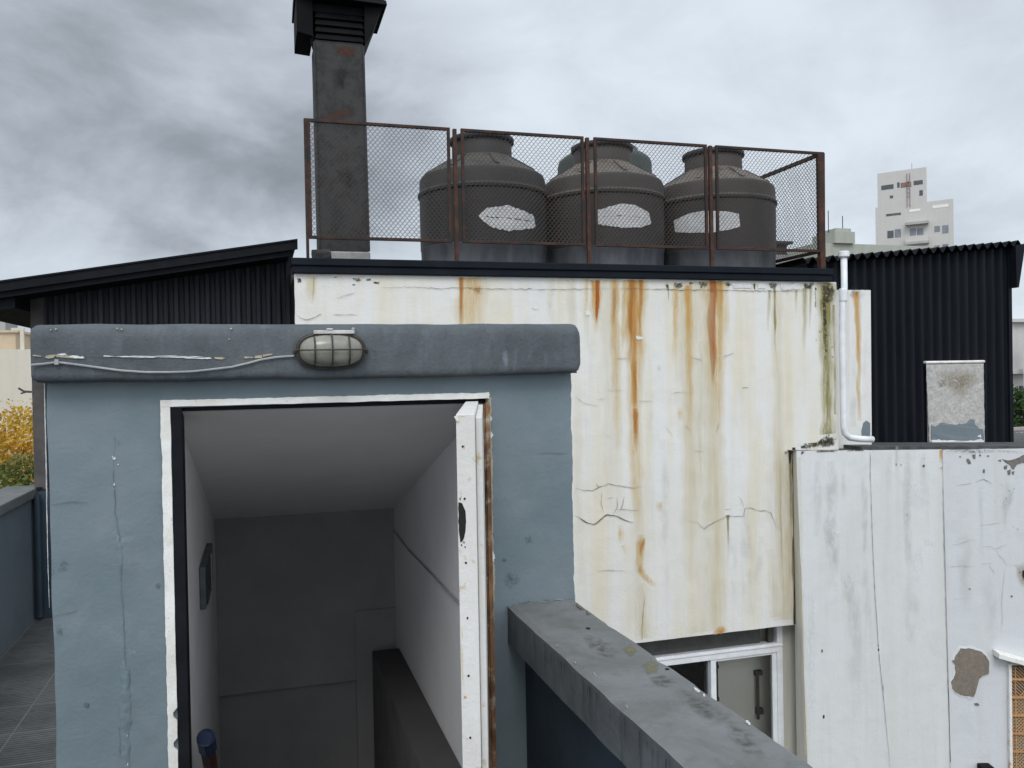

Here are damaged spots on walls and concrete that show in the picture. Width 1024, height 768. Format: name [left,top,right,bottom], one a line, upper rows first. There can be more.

corrosion [459,277,480,315]
corrosion [708,280,723,376]
corrosion [591,280,643,436]
peeling [931,434,1024,475]
spalling [458,498,466,548]
crack [547,483,641,525]
crack [695,462,782,554]
corrosion [637,540,648,580]
peeling [948,645,992,706]